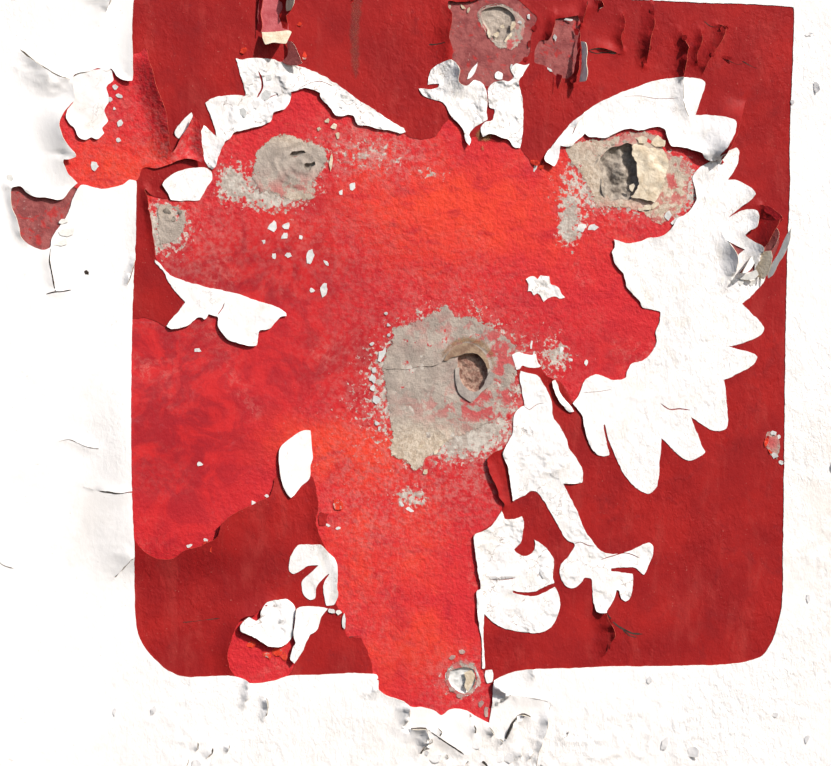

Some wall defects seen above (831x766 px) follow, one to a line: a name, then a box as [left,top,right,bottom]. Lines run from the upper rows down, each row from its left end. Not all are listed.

peeling [88,0,110,13]
peeling [257,0,307,66]
peeling [448,0,588,89]
peeling [610,12,626,47]
peeling [633,4,655,63]
peeling [7,49,204,250]
peeling [721,204,791,286]
peeling [125,75,709,766]